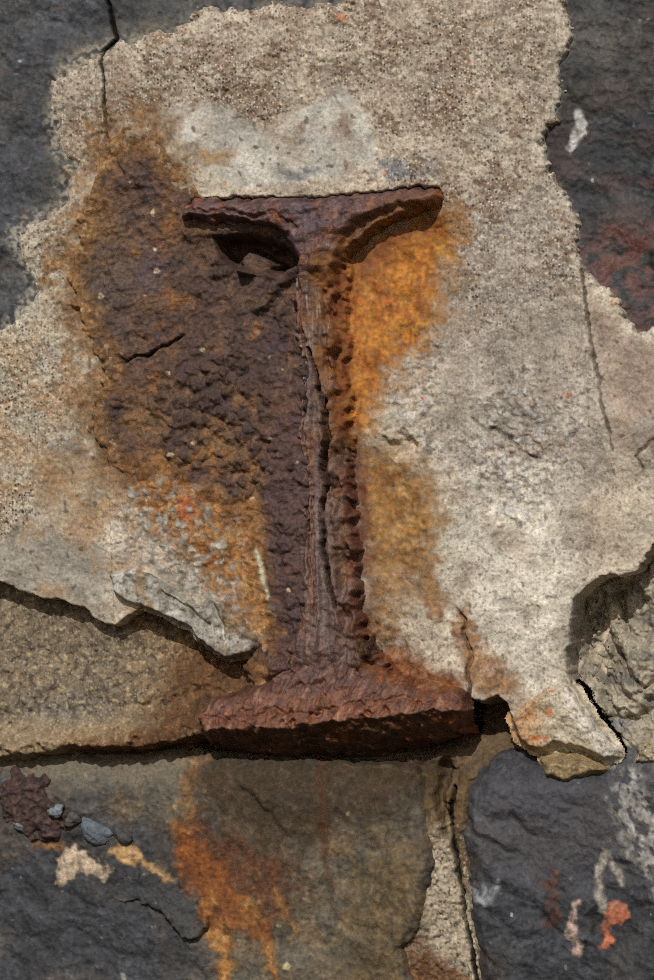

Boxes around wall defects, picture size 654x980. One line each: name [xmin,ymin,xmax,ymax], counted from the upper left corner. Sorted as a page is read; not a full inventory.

crack [100,0,119,136]
corrosion [40,96,516,746]
spalling [0,568,260,763]
spalling [576,561,654,763]
corrosion [170,825,298,980]
corrosion [406,942,469,980]
crack [450,785,479,980]